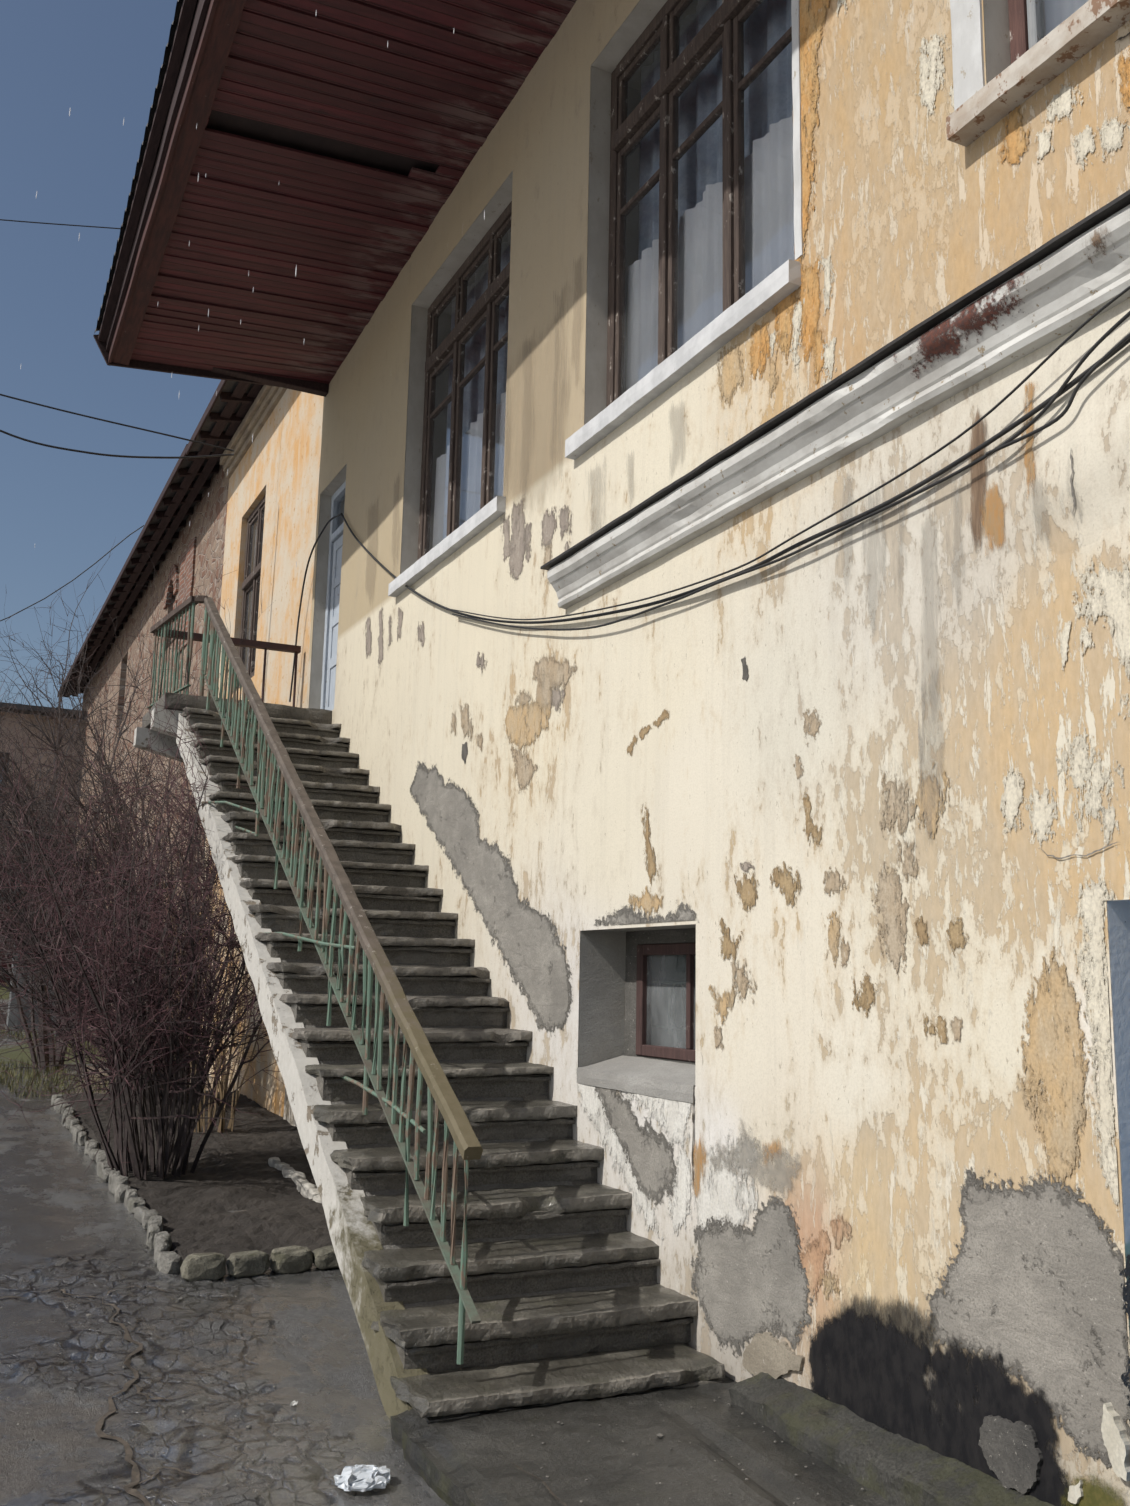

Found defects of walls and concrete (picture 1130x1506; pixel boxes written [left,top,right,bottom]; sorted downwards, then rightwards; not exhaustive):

corrosion [893,272,1025,379]
spalling [410,761,574,1038]
peeling [503,652,577,795]
spalling [595,802,699,931]
peeling [708,860,802,1049]
peeling [823,866,878,1017]
peeling [870,758,952,978]
peeling [1000,727,1130,857]
spalling [575,1070,853,1379]
spalling [923,877,1130,1481]
damp [808,1297,1071,1506]
spalling [978,1415,1043,1494]